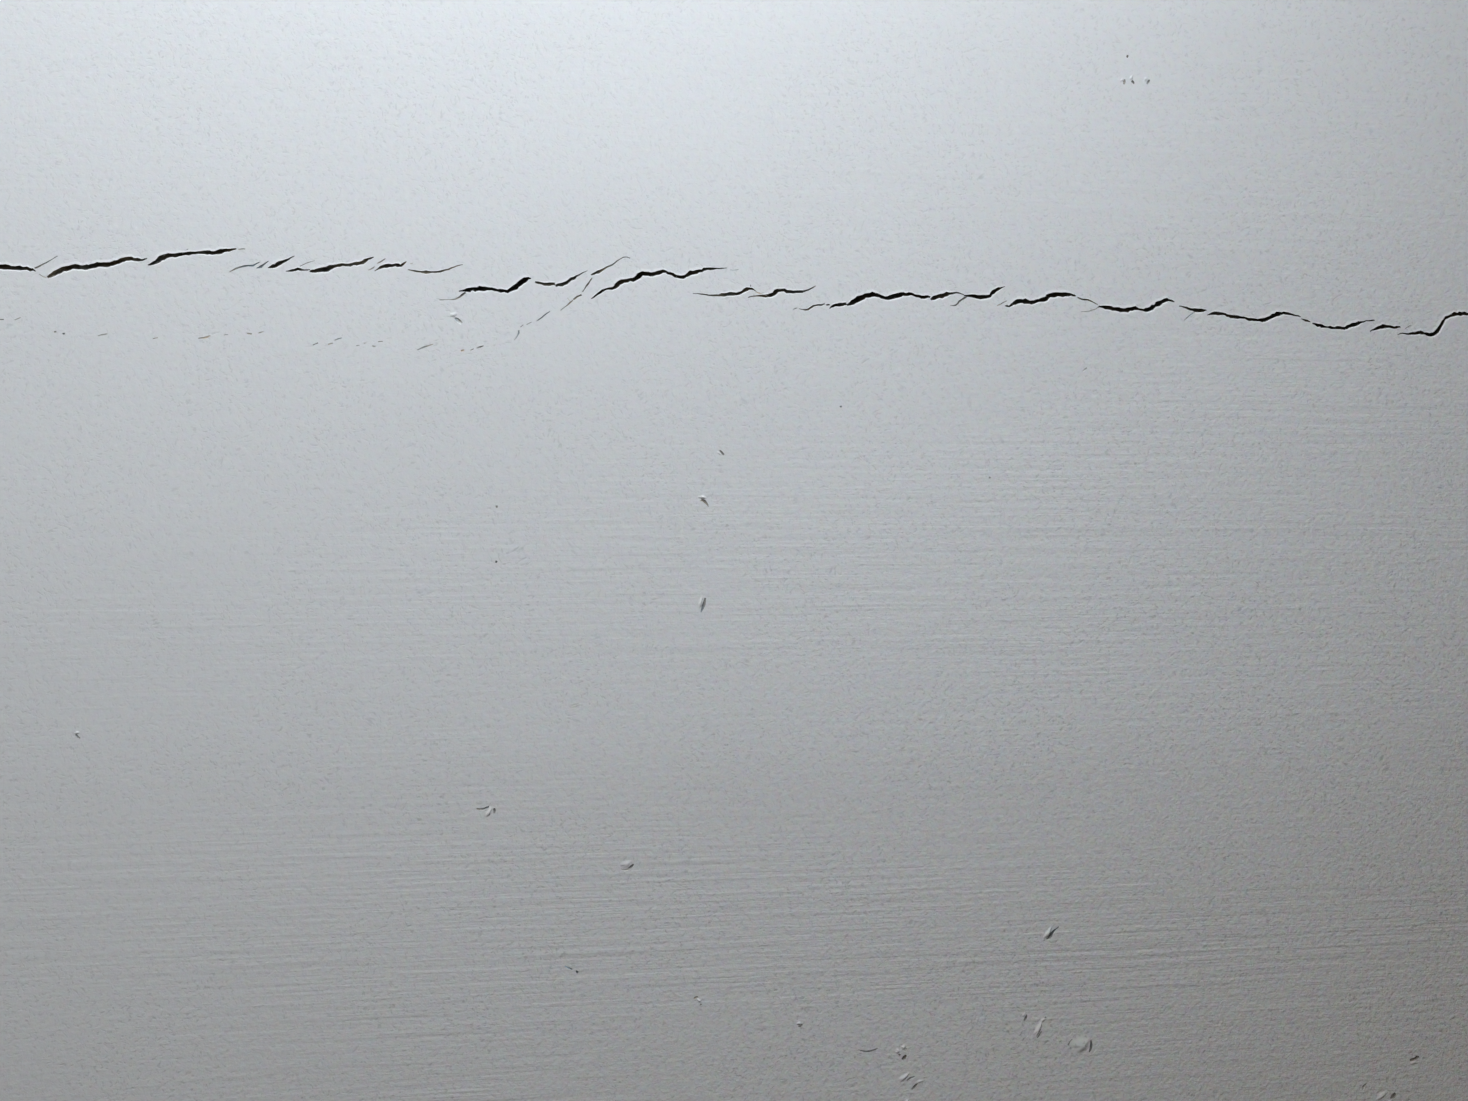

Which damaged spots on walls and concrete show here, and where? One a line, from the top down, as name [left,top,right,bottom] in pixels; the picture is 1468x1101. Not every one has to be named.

crack [0,246,1468,352]